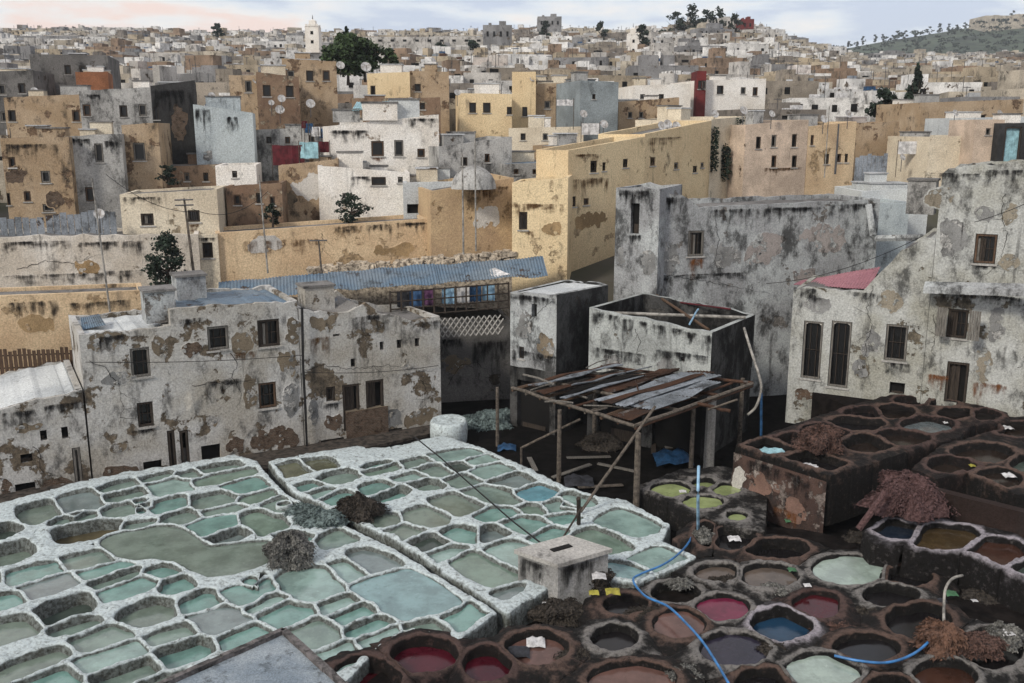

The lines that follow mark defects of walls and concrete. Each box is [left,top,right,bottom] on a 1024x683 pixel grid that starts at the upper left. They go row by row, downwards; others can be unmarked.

peeling [541,210,608,237]
damp [715,203,875,221]
peeling [938,202,1019,259]
spalling [180,340,203,359]
damp [473,342,555,363]
spalling [224,313,343,455]
peeling [730,456,808,526]